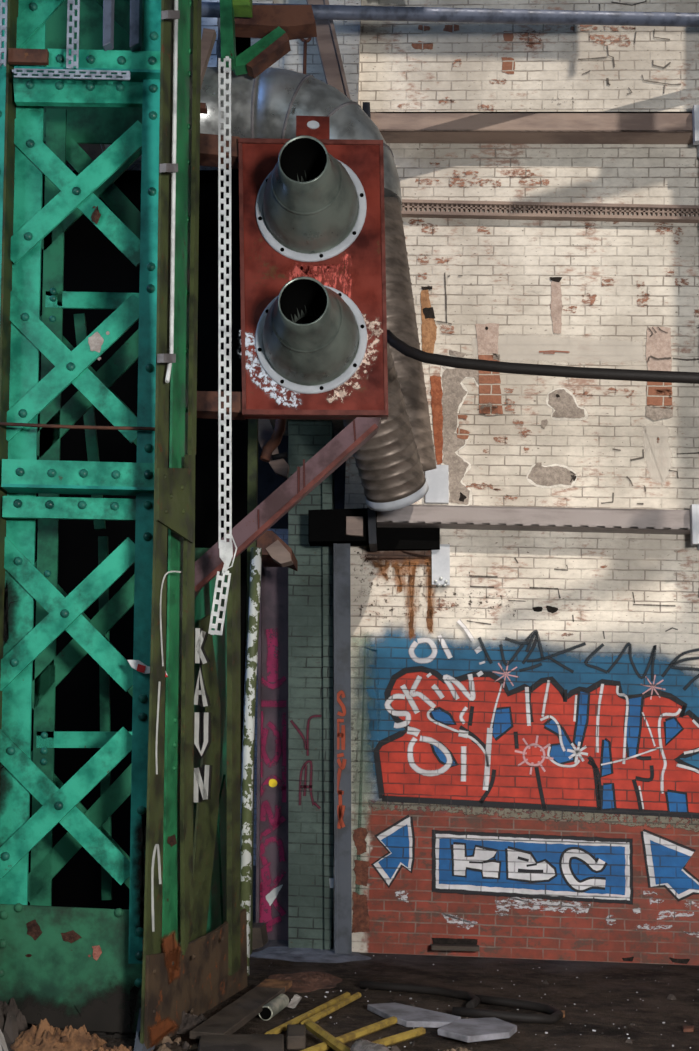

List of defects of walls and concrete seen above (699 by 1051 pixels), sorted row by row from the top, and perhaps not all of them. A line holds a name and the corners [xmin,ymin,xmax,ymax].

peeling [289,254,352,298]
peeling [239,330,301,407]
peeling [327,314,383,403]
peeling [440,277,673,506]
rust [365,546,434,638]
rust [26,920,42,940]
rust [61,930,81,943]